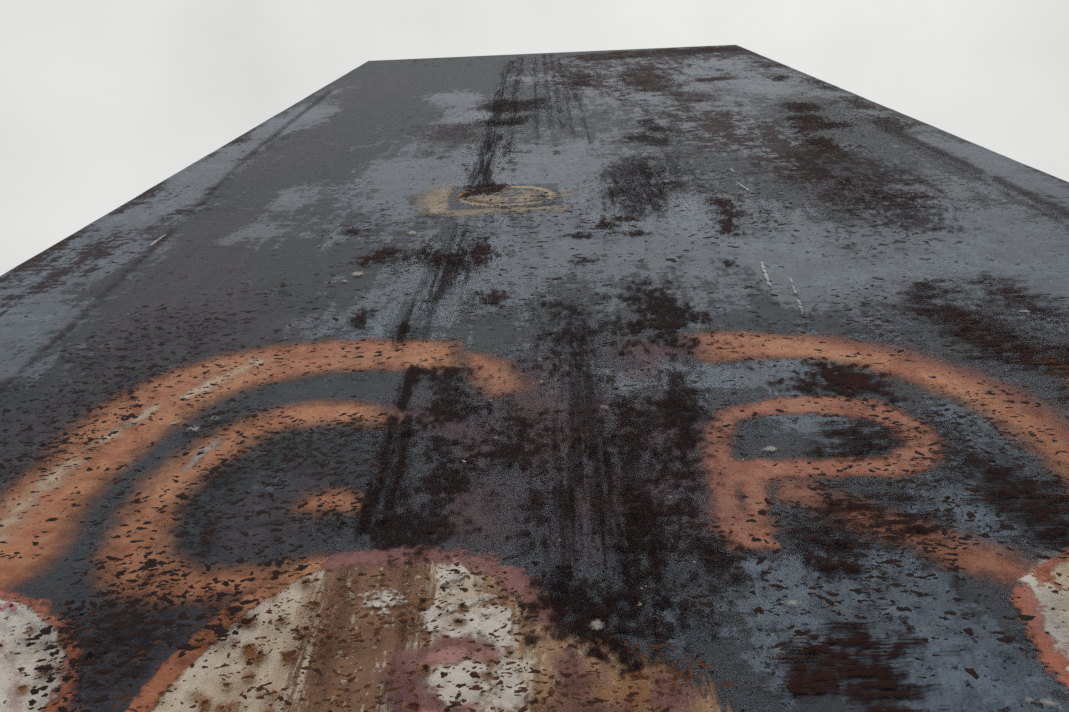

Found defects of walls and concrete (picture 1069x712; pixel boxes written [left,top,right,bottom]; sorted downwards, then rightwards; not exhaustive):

corrosion [457,182,511,204]
corrosion [827,183,982,242]
corrosion [994,176,1069,215]
corrosion [346,231,516,272]
corrosion [871,271,1069,403]
peeling [0,162,1069,712]
corrosion [756,616,960,712]